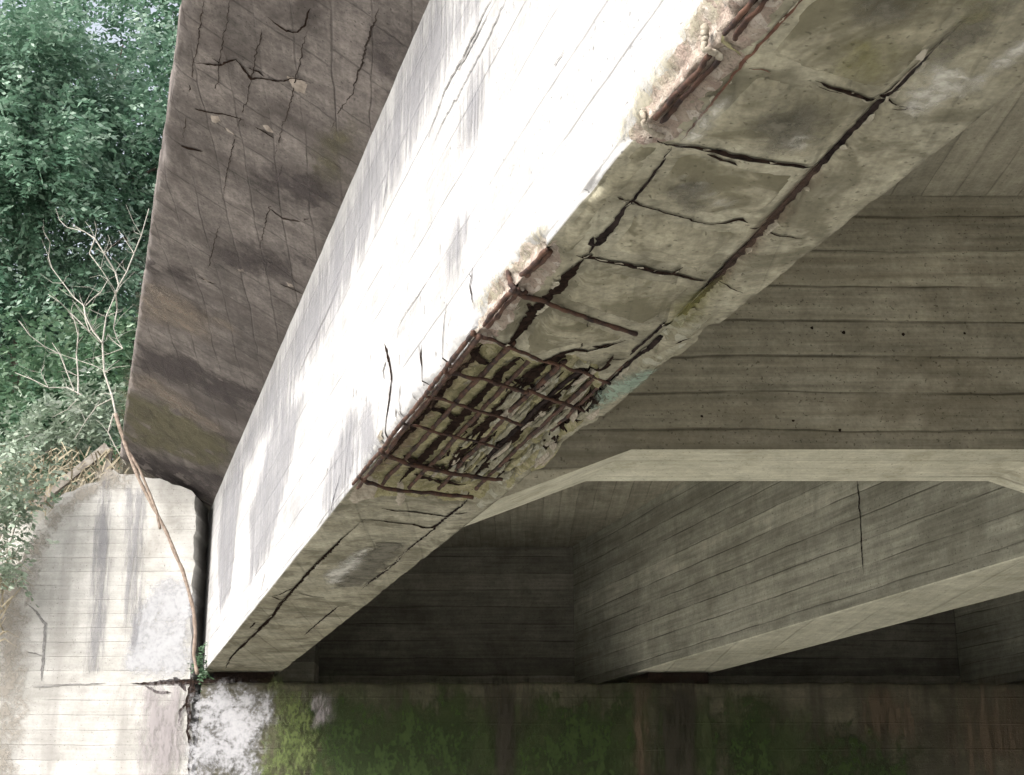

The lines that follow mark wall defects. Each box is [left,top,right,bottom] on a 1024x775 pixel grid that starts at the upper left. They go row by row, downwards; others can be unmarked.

crack [181,1,311,199]
crack [331,9,379,128]
spalling [628,0,784,145]
crack [260,198,307,244]
crack [505,0,969,388]
damp [0,0,468,775]
crack [377,284,452,446]
spalling [349,235,710,508]
crack [856,483,864,574]
crack [26,603,102,687]
crack [133,492,470,775]